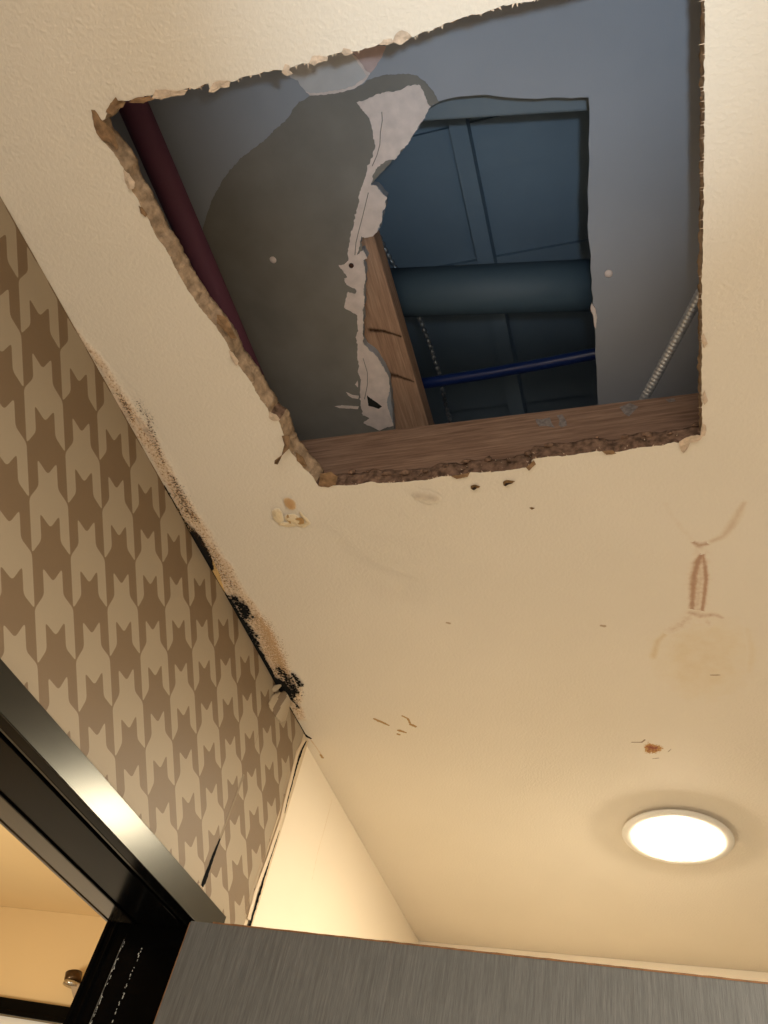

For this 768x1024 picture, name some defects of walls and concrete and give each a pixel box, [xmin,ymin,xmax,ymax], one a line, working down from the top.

spalling [91,0,708,487]
water stain [116,393,164,463]
peeling [72,322,313,723]
water stain [164,476,307,737]
crack [245,735,324,926]